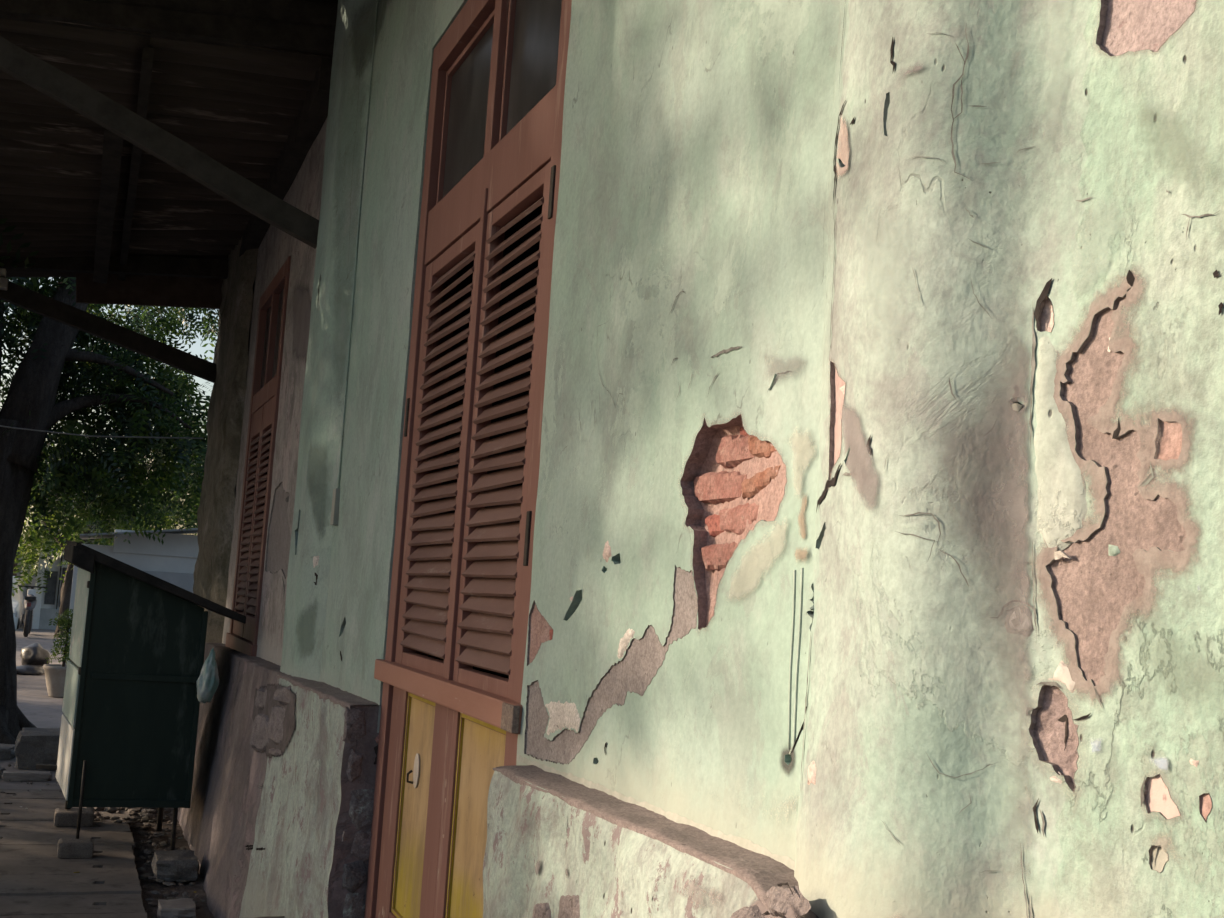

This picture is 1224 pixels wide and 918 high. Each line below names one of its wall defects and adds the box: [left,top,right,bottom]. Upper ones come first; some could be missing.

flaking render [1096,0,1197,56]
leakage [836,118,849,175]
flaking render [828,361,850,487]
leakage [841,406,878,507]
leakage [979,398,1029,609]
flaking render [1026,270,1200,792]
flaking render [516,414,814,918]
flaking render [1033,798,1045,836]
peeling [1141,774,1181,819]
peeling [1199,793,1212,822]
peeling [1148,836,1170,873]